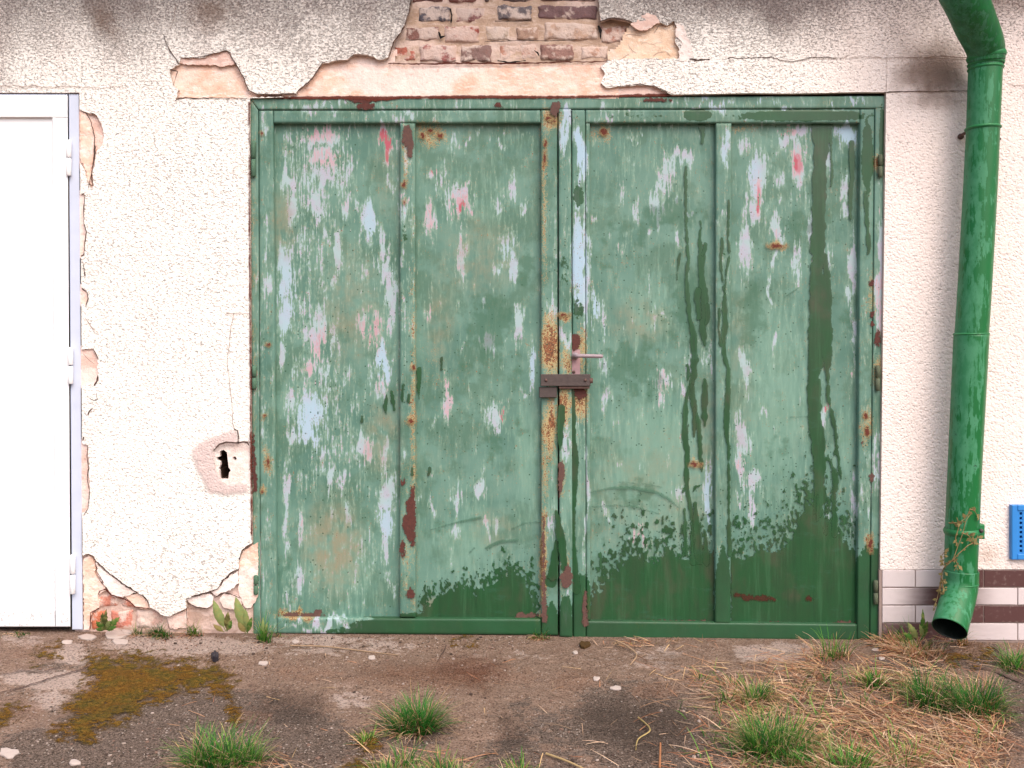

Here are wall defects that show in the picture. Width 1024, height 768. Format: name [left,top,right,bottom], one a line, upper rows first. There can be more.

spalling [164,0,693,101]
peeling [402,124,415,158]
spalling [79,106,104,306]
peeling [572,334,581,351]
spalling [81,346,99,388]
rust [574,389,588,399]
spalling [193,429,252,494]
peeling [557,460,565,498]
peeling [402,486,417,542]
spalling [75,543,261,633]
peeling [559,565,574,588]
rust [733,593,776,602]